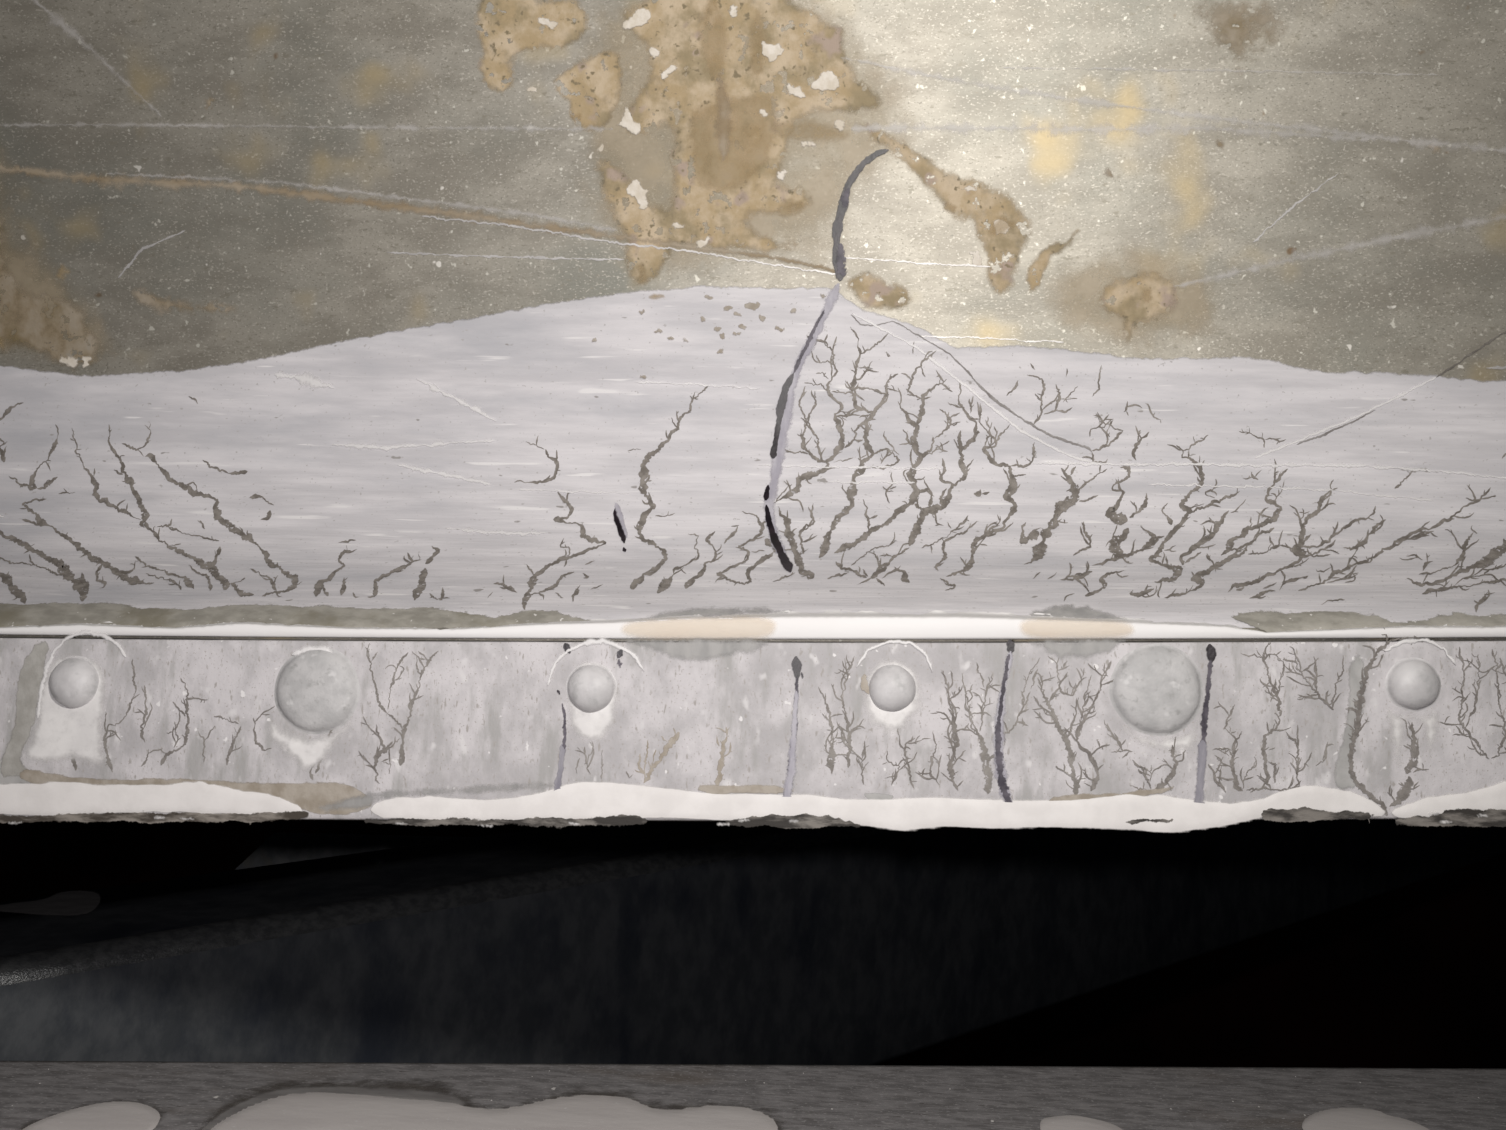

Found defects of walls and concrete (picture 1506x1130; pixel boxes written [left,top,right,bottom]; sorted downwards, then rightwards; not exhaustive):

damp [0,222,98,368]
peeling [701,295,784,353]
crack [0,402,448,604]
crack [488,327,1506,612]
crack [71,659,275,771]
crack [309,643,438,784]
crack [575,727,732,785]
crack [818,626,1506,823]
damp [201,1083,476,1130]